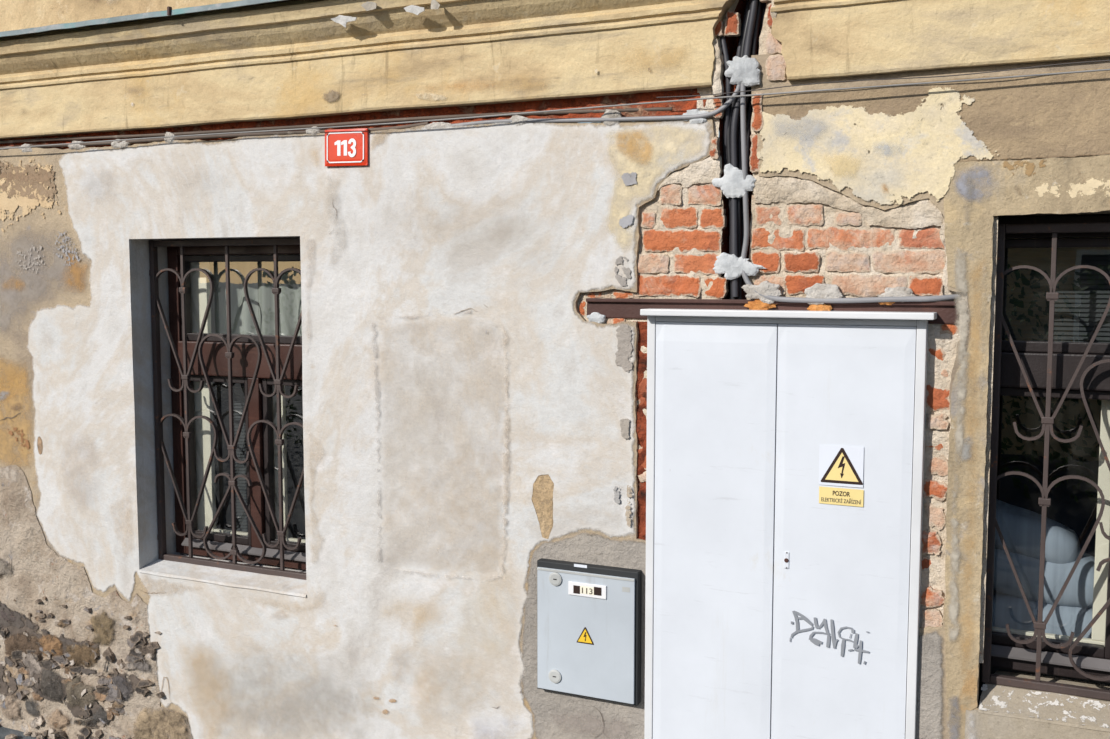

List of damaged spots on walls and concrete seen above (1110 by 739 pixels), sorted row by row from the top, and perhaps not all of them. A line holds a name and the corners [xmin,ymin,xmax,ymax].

peeling [0,159,61,231]
spalling [578,0,786,321]
spalling [0,465,192,739]
spalling [532,475,554,539]
spalling [603,318,647,540]
spalling [746,87,998,663]
peeling [979,684,1110,728]